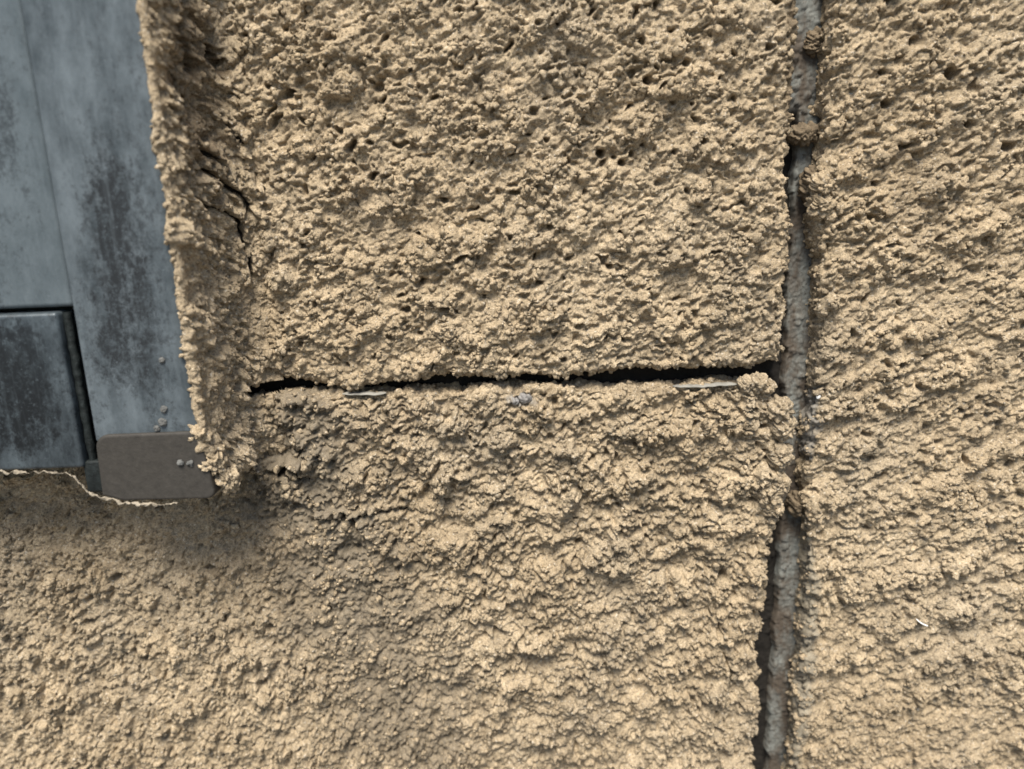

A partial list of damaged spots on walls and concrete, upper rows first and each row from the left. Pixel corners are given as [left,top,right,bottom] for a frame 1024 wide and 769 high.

spalling [168,32,229,86]
crack [200,150,253,270]
crack [278,466,310,482]
crack [323,507,412,530]